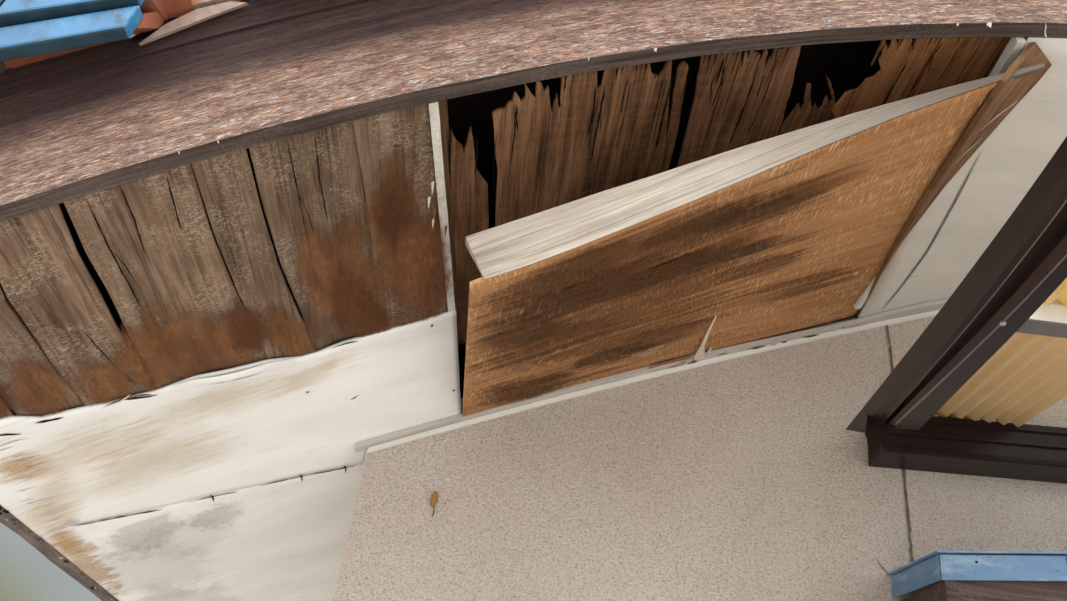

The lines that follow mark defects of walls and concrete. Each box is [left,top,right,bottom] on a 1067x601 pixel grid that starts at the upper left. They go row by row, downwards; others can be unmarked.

crack [86,187,145,312]
crack [166,175,182,231]
crack [286,133,350,280]
leakage [299,152,450,337]
peeling [428,165,447,236]
leakage [469,164,857,408]
leakage [0,362,65,417]
crack [82,330,156,407]
leakage [79,303,317,404]
crack [260,464,364,486]
crack [875,469,914,573]